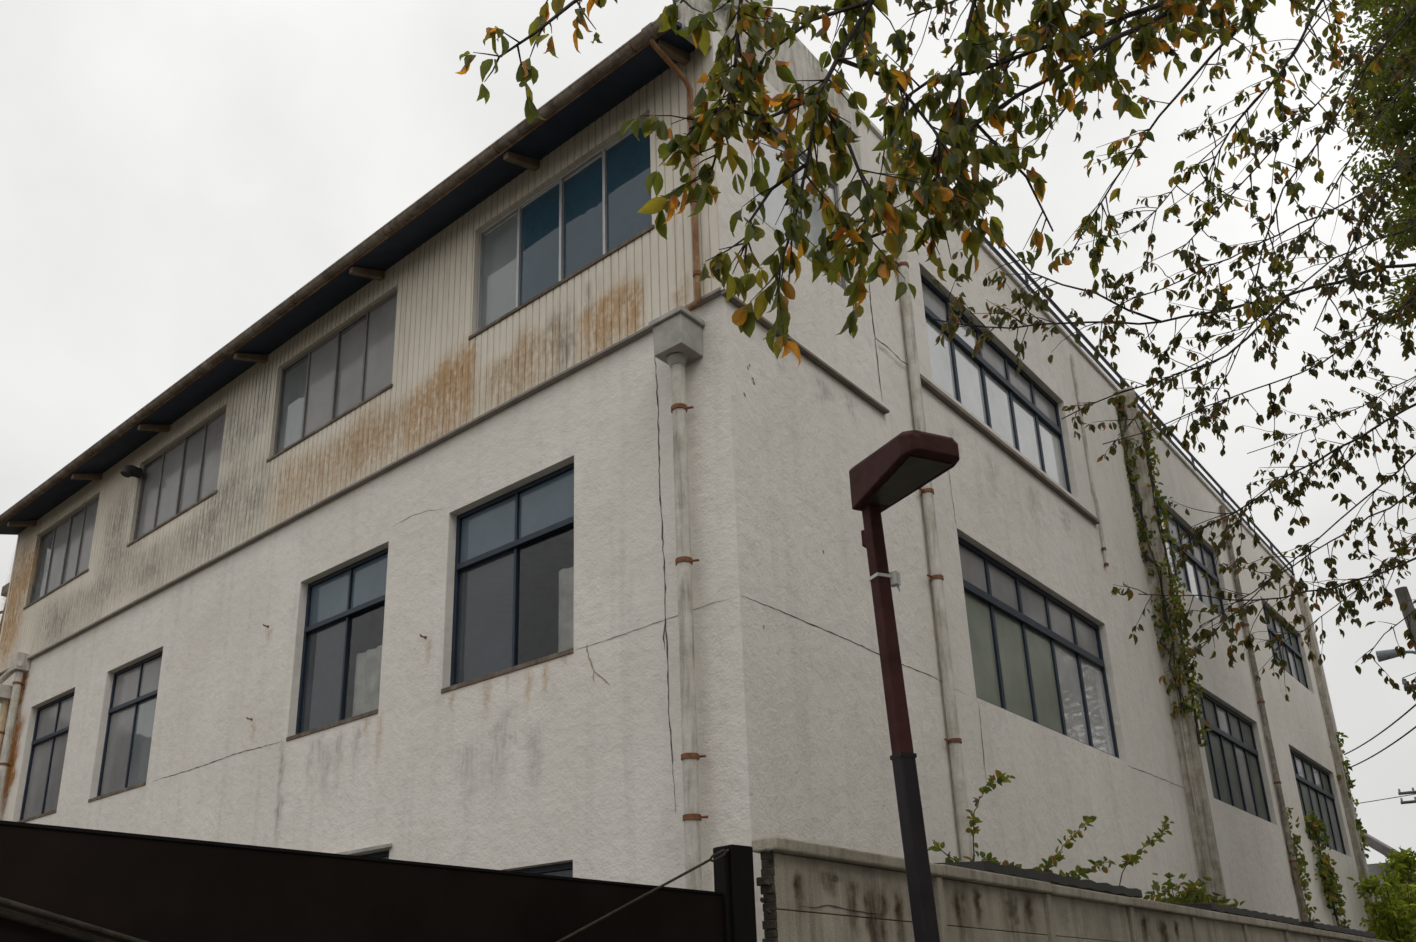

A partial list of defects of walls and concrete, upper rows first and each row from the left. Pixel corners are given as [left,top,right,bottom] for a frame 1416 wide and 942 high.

crack [576,362,986,812]
damp [830,876,903,942]
damp [955,891,981,918]
damp [1143,918,1179,942]